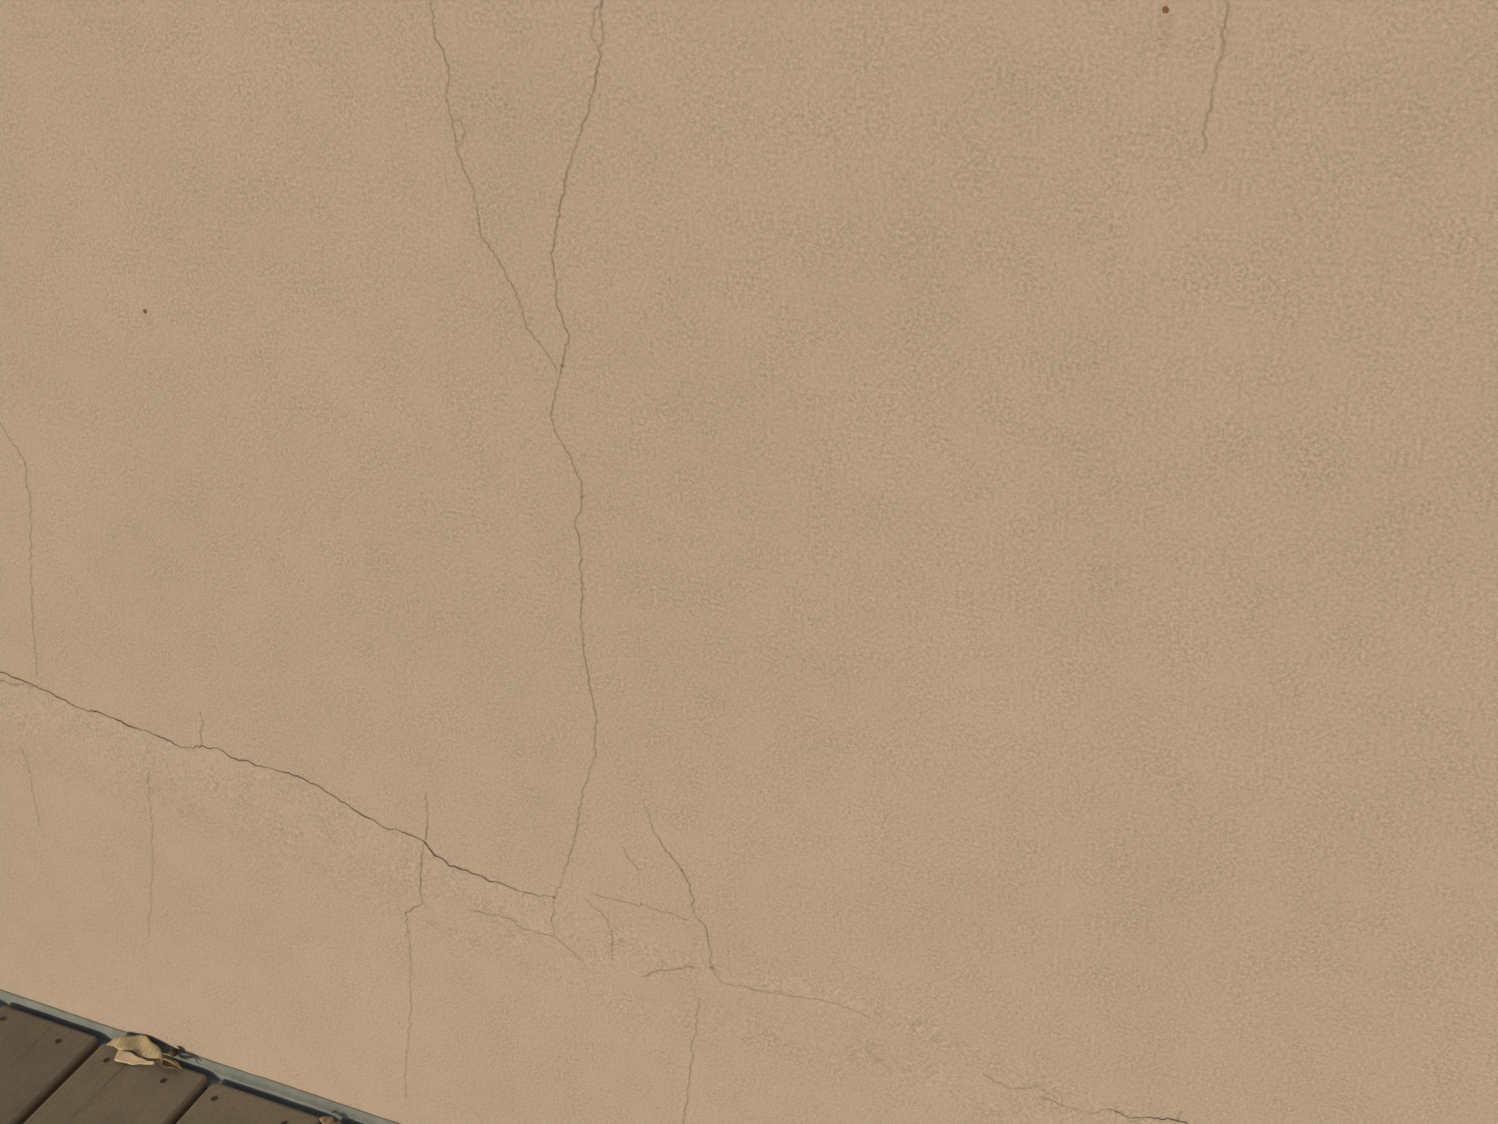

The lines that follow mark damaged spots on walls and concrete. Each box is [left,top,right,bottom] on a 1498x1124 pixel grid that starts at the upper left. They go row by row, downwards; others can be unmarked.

crack [0,672,556,900]
crack [1103,1109,1187,1124]